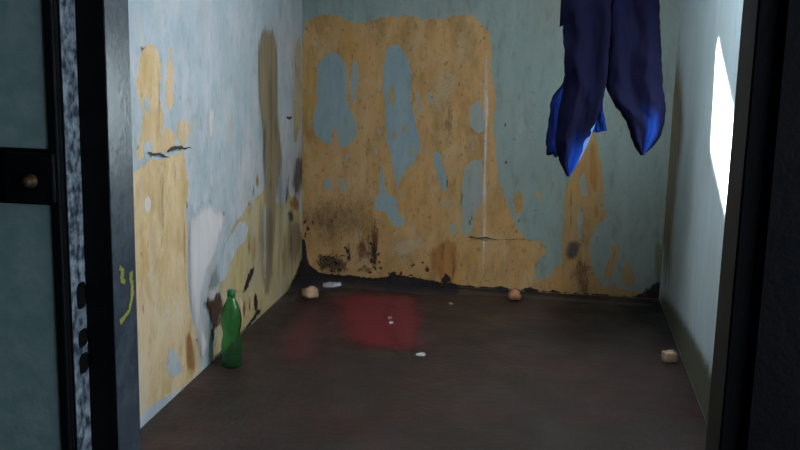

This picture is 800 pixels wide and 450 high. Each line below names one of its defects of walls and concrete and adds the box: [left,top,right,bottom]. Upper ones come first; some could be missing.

peeling [133,43,201,415]
peeling [213,14,650,360]
leakage [235,26,712,423]